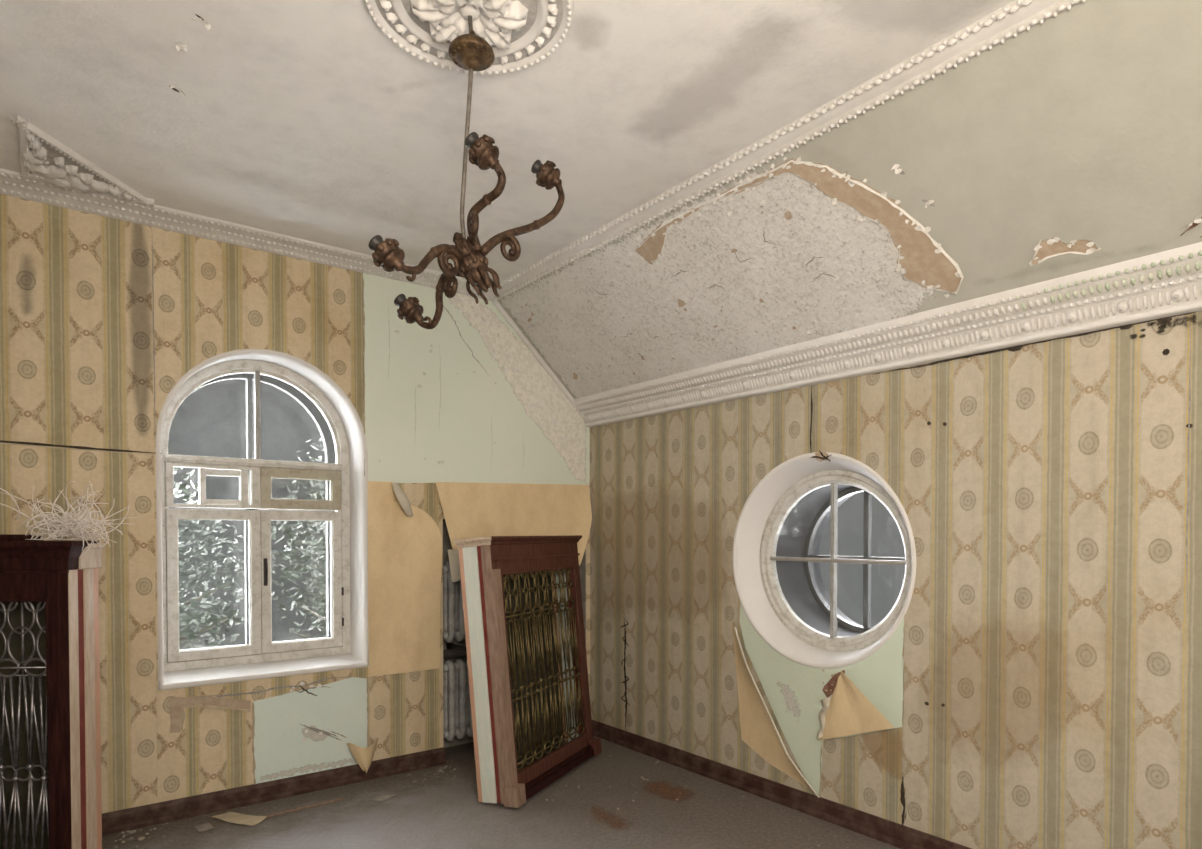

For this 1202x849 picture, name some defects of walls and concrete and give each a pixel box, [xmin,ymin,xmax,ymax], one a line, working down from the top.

peeling [363,156,964,485]
peeling [252,677,378,784]
peeling [739,603,905,796]